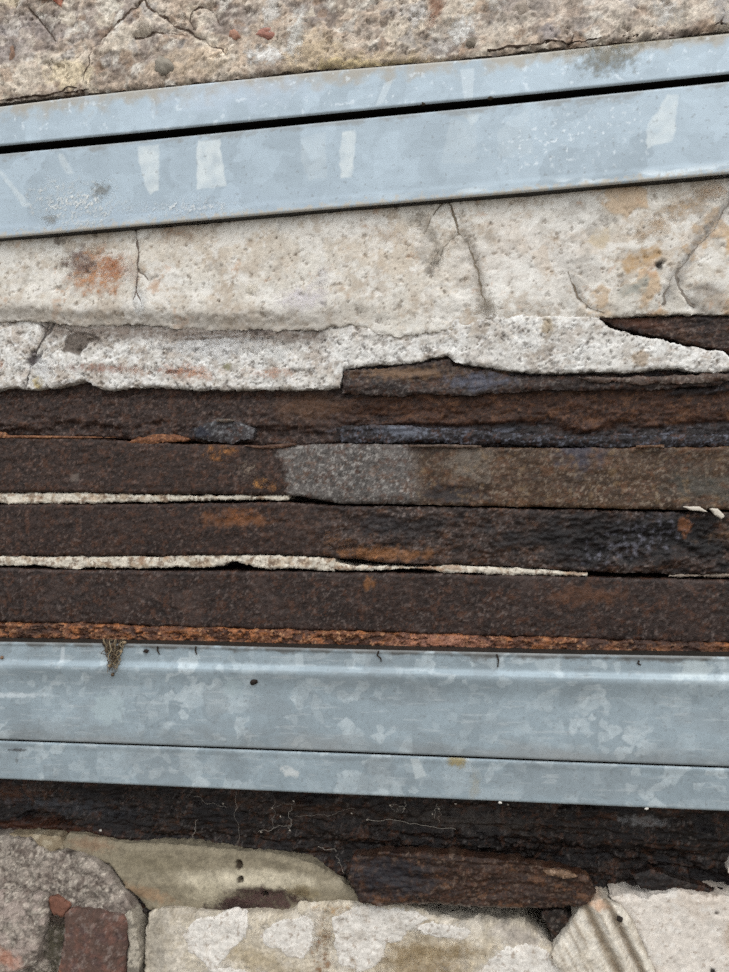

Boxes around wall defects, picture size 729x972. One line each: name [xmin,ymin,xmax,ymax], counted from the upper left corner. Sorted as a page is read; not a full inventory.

crack [2,0,226,101]
corrosion [62,251,121,295]
crack [133,231,148,312]
crack [424,203,489,319]
crack [568,272,604,313]
crack [662,203,729,307]
peeling [579,372,729,386]
peeling [543,868,577,879]